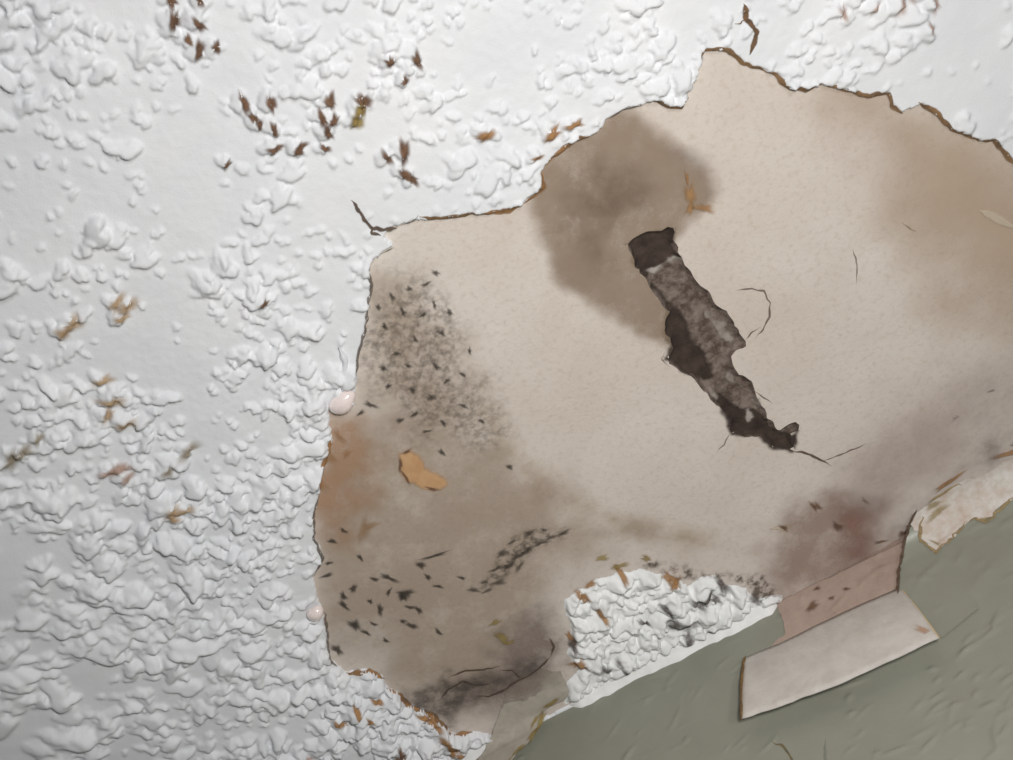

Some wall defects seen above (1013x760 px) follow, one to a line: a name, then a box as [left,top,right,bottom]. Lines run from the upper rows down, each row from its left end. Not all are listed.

water stain [535,114,709,341]
peeling [312,47,1013,760]
water stain [471,529,567,592]
water stain [350,600,383,635]
water stain [371,575,422,613]
water stain [415,624,555,716]
crack [773,742,793,760]